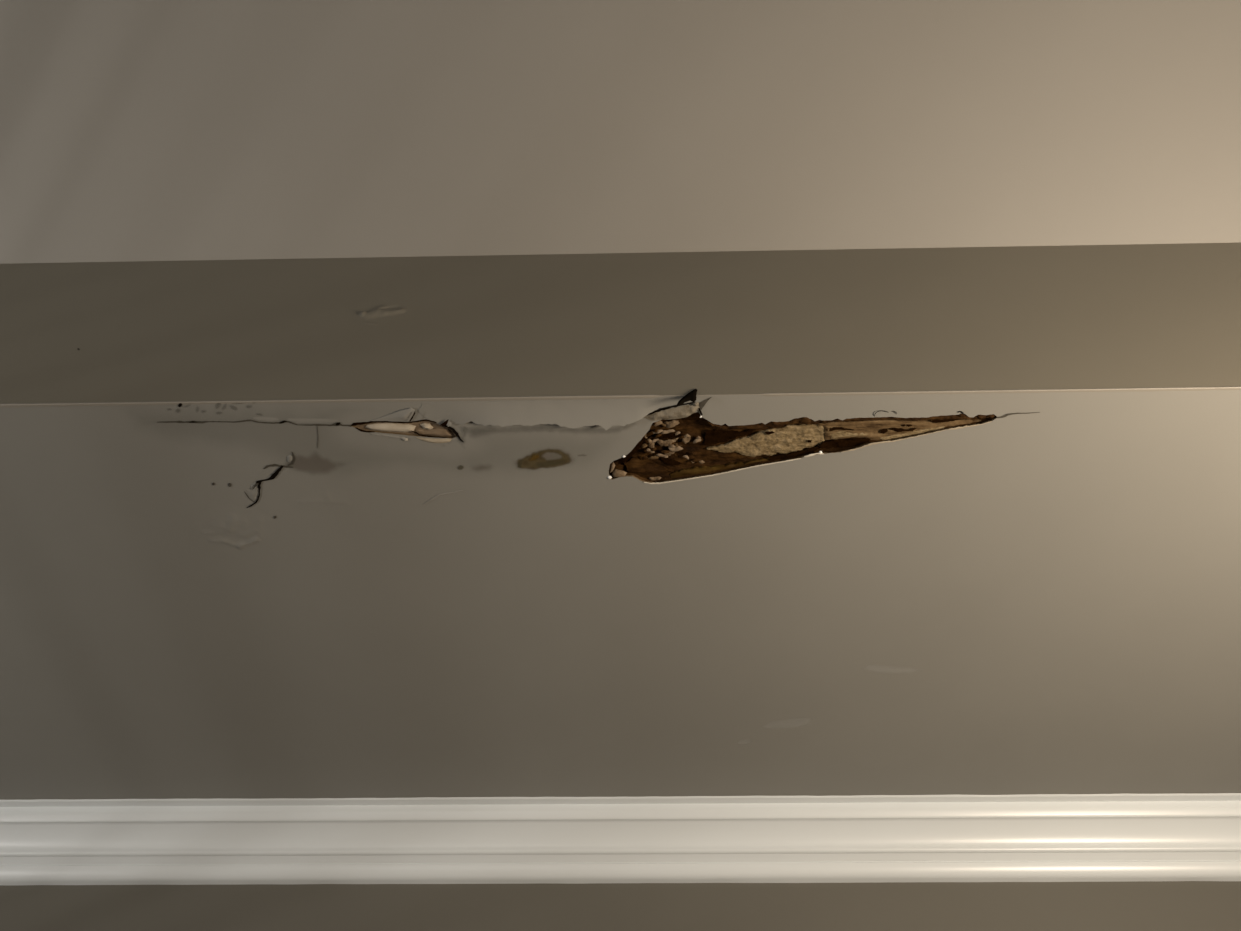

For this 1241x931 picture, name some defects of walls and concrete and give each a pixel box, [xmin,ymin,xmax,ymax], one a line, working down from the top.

peeling [351,389,996,443]
crack [158,416,351,508]
leakage [518,449,570,469]